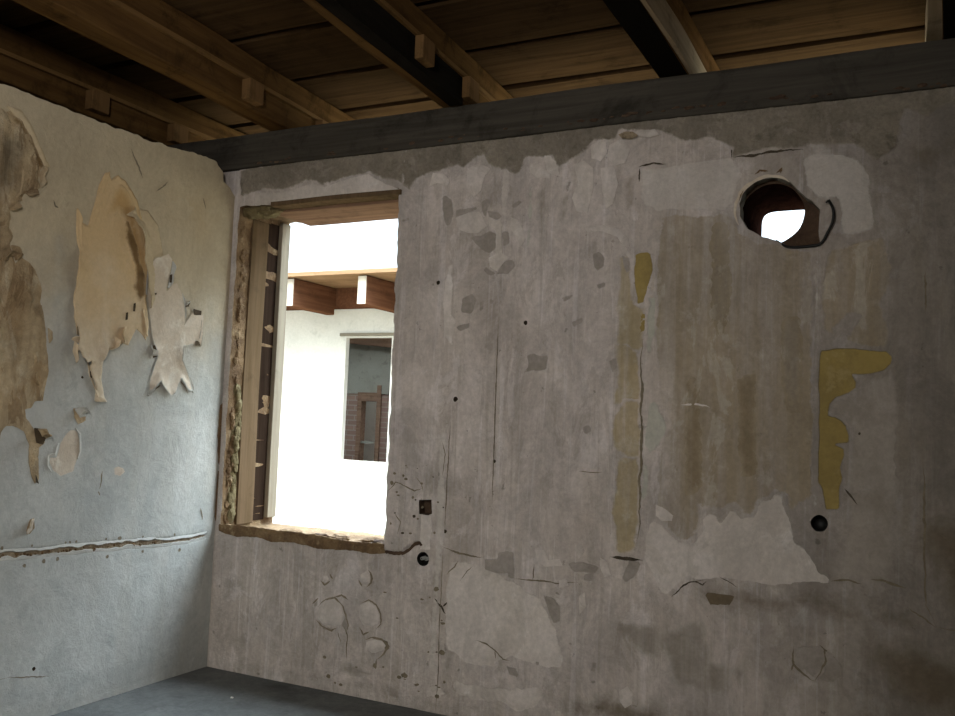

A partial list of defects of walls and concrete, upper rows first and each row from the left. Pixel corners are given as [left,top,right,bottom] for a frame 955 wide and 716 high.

peeling [0,172,204,484]
peeling [214,87,955,677]